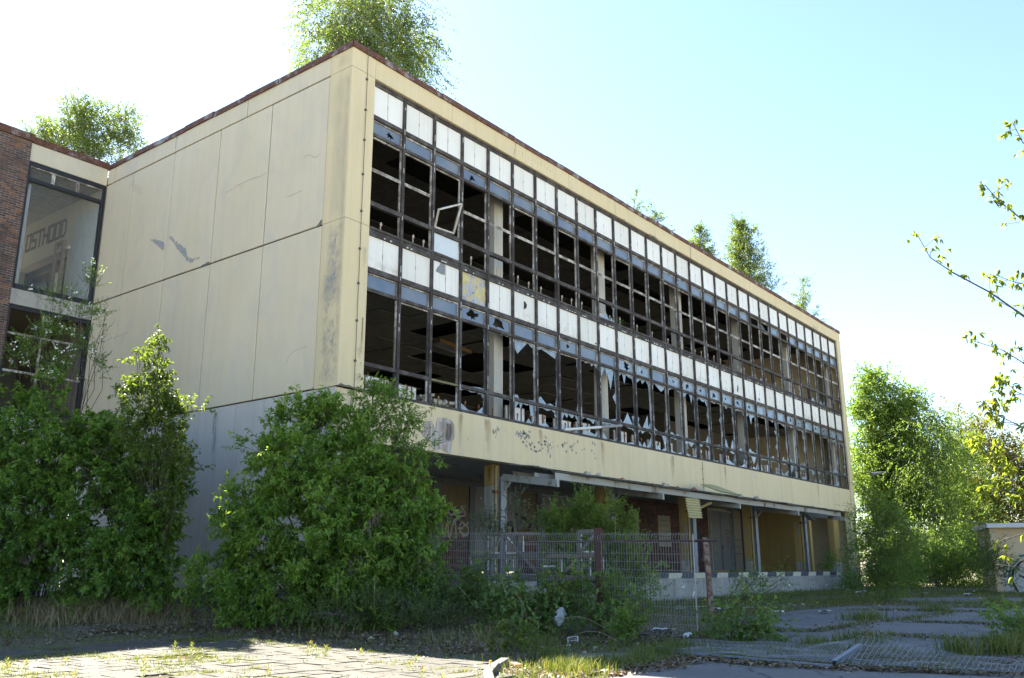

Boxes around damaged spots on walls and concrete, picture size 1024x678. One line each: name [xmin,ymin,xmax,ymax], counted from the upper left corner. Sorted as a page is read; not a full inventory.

peeling [493,426,596,459]